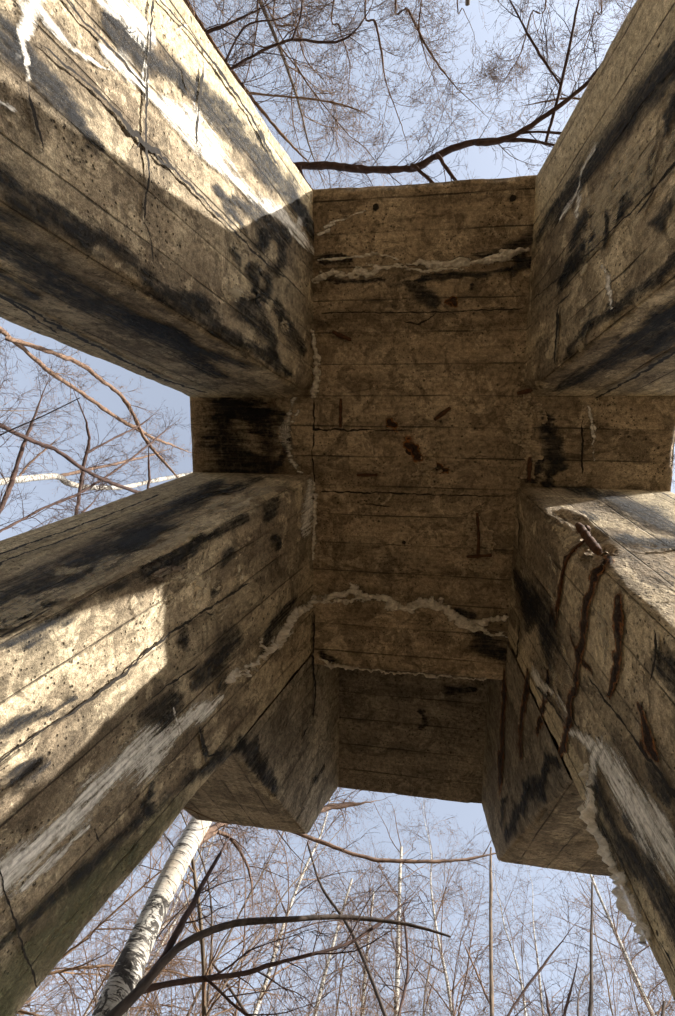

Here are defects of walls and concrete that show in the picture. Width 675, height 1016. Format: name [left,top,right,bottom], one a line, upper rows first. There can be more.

crack [27,82,44,155]
crack [39,0,286,278]
damp [0,0,675,398]
damp [0,397,319,651]
damp [525,405,675,547]
damp [0,582,513,950]
damp [500,752,563,842]
damp [513,570,568,715]
corrosion [548,522,615,760]
corrosion [606,594,624,700]
damp [568,728,675,949]
damp [653,648,675,696]